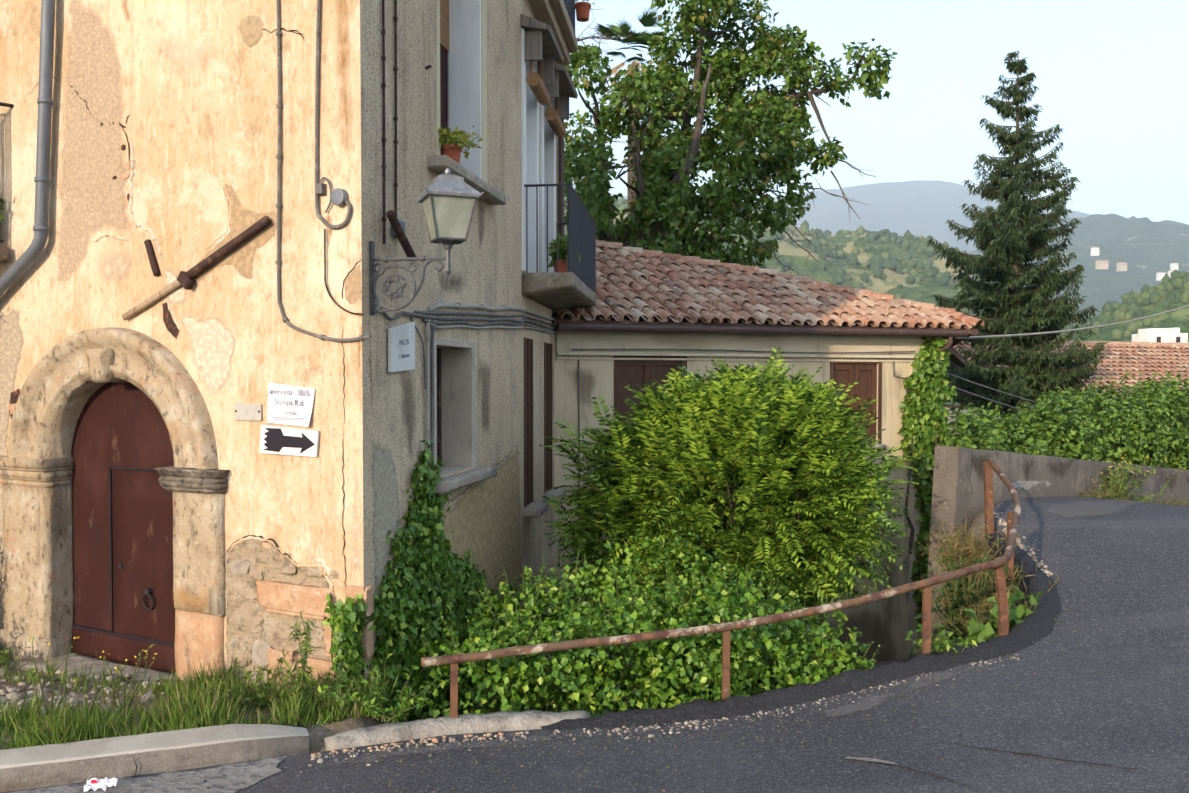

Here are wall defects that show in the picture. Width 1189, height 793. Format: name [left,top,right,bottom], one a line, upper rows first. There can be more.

crack [27,77,130,159]
peeling [59,0,277,393]
spalling [225,443,399,695]